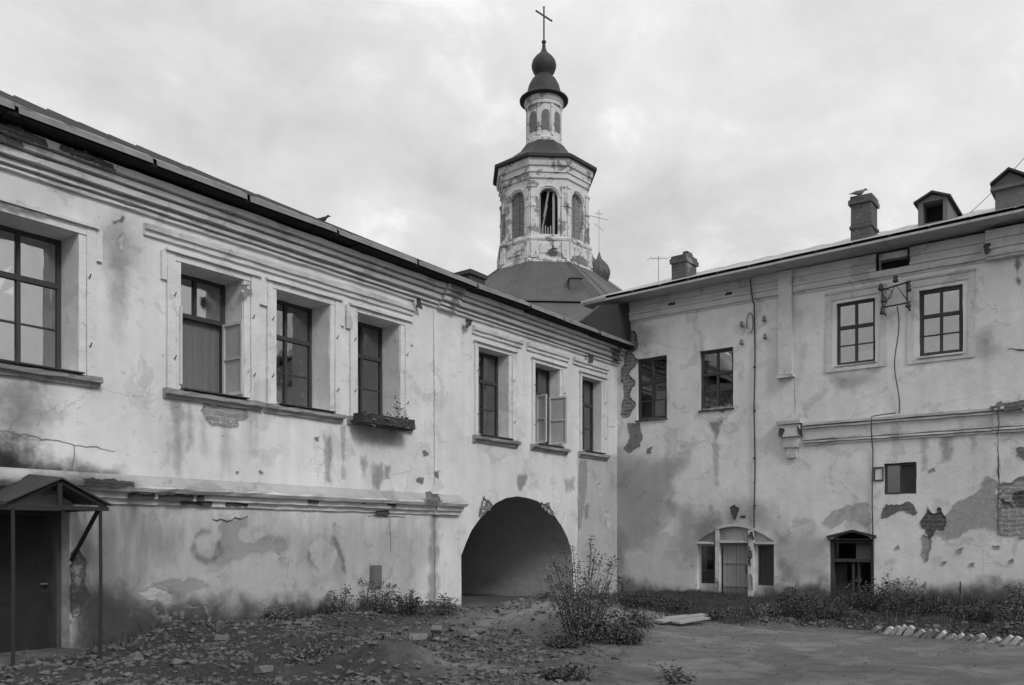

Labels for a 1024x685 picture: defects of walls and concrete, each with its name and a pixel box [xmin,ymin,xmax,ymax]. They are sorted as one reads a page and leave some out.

crack [0,430,110,467]
spalling [202,403,249,428]
flaking render [610,331,652,454]
flaking render [881,502,946,562]
flaking render [992,476,1024,550]
spalling [69,549,89,623]